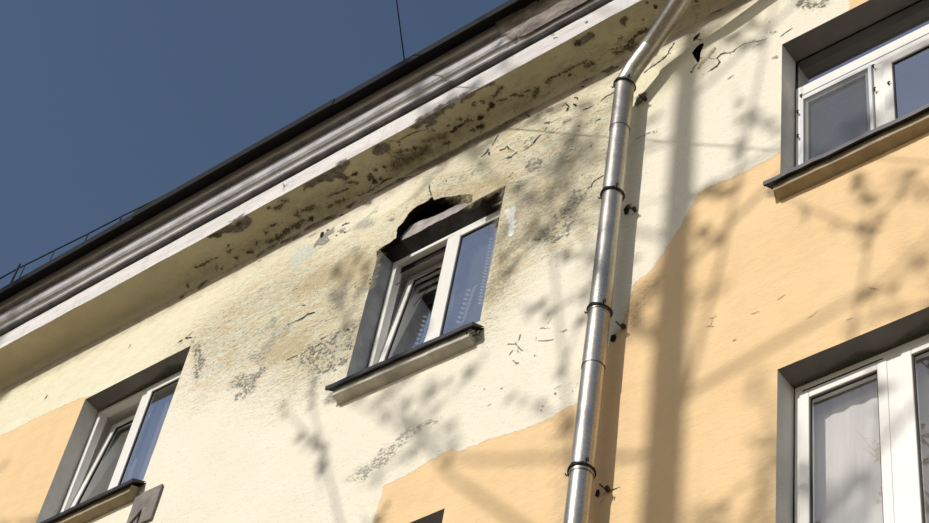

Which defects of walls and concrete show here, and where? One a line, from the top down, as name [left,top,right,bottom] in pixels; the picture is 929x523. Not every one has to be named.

spalling [495,0,590,39]
flaking render [575,33,595,46]
peeling [611,19,648,55]
crack [691,36,767,75]
spalling [194,61,618,271]
flaking render [227,317,289,400]
flaking render [298,326,356,373]
flaking render [349,419,437,481]